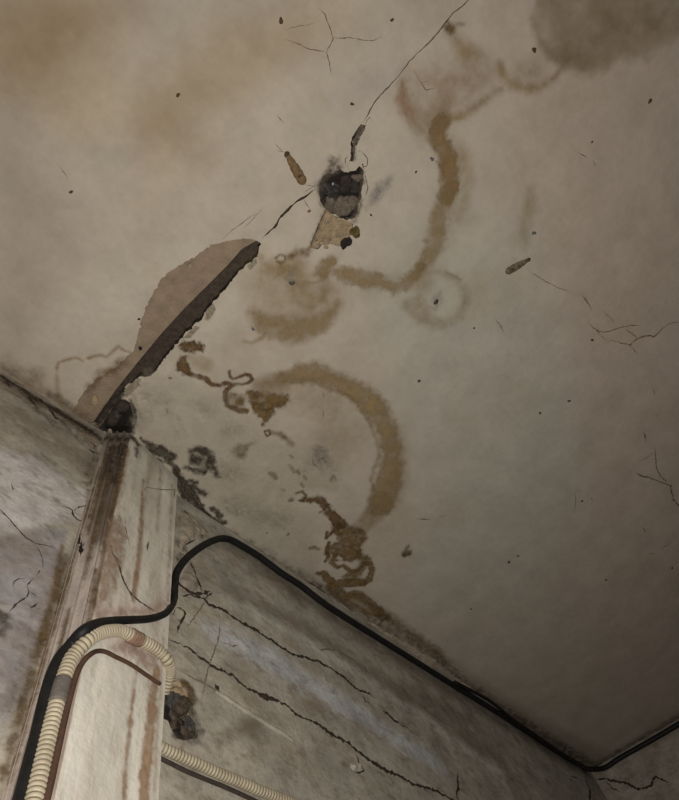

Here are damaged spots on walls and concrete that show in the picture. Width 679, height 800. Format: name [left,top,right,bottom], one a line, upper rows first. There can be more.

crack [362,0,468,123]
crack [265,184,316,236]
hole [310,124,368,250]
water stain [317,249,436,290]
water stain [429,112,461,236]
spalling [71,238,256,484]
mould [140,437,227,525]
water stain [266,363,401,515]
crack [1,510,56,613]
hole [163,680,200,742]
crack [107,516,460,800]
crack [571,775,668,800]